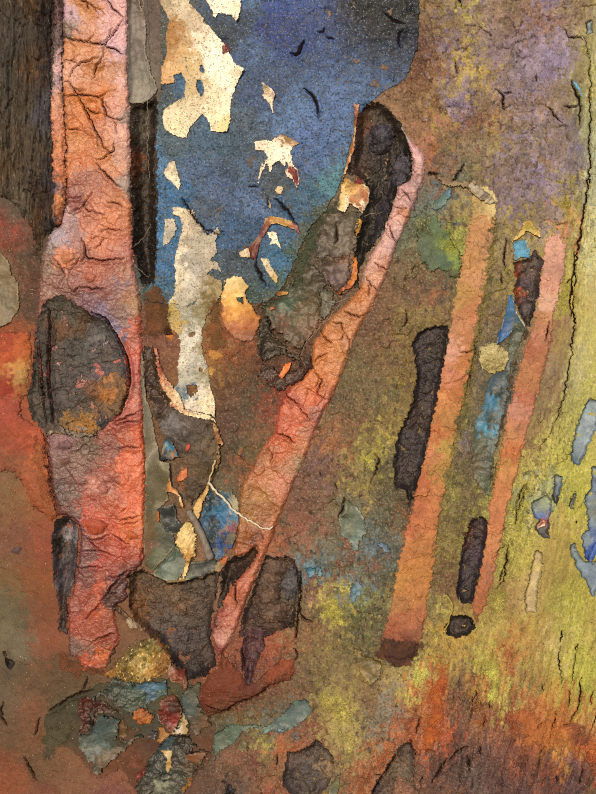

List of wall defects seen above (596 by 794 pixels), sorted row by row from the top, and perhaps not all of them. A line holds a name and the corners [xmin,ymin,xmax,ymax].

crack [51,0,124,292]
spalling [128,96,158,287]
spalling [346,101,413,289]
crack [540,29,592,449]
crack [39,310,54,423]
crack [94,313,143,426]
peeling [219,276,314,391]
spalling [393,325,449,506]
crack [79,508,138,620]
spalling [78,487,300,775]
rust [424,668,447,751]
rust [505,701,596,764]